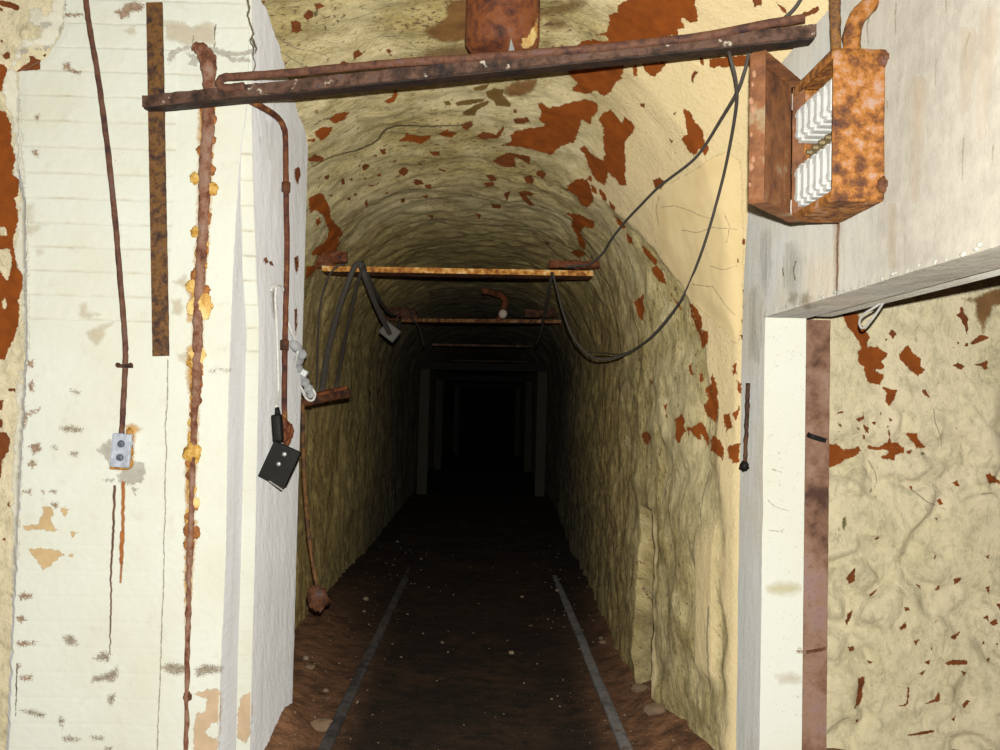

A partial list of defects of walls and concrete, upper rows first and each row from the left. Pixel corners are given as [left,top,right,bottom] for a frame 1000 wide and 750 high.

peeling [578,0,698,45]
peeling [399,61,667,284]
peeling [0,111,23,360]
peeling [305,193,343,278]
peeling [953,307,989,348]
corrosion [187,365,204,442]
peeling [664,363,741,463]
peeling [829,313,925,468]
spalling [23,501,69,532]
corrosion [109,425,138,653]
corrosion [184,461,198,527]
spalling [193,689,223,750]